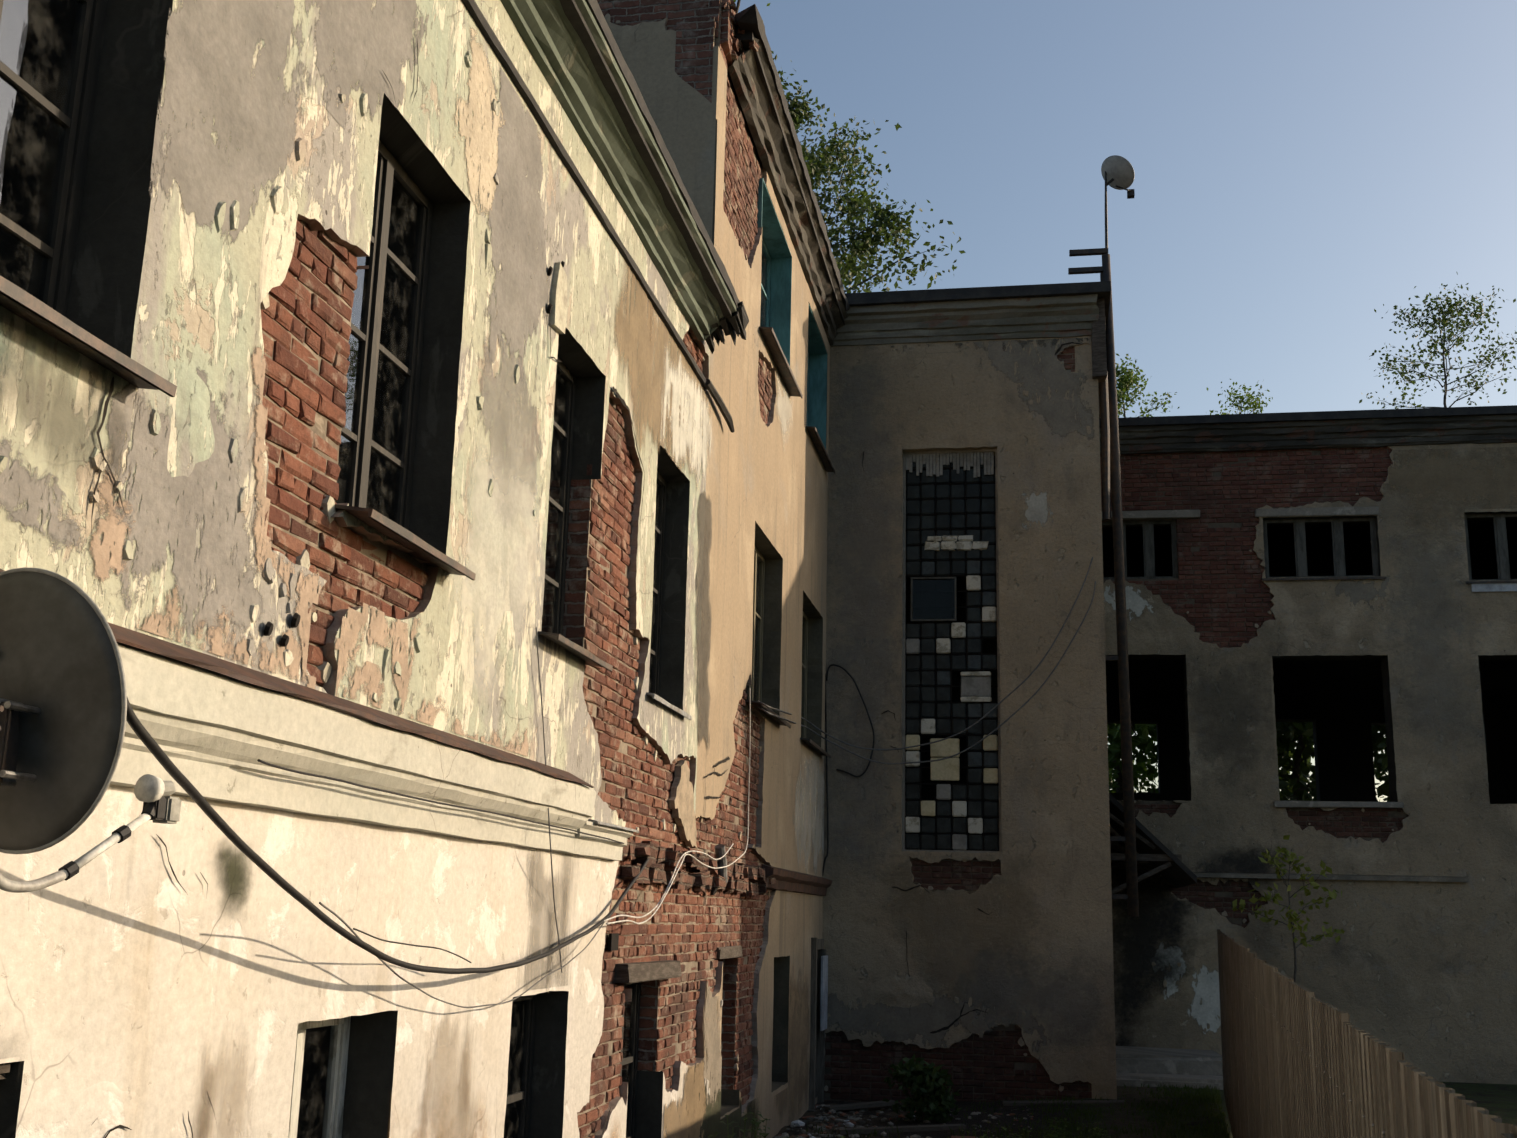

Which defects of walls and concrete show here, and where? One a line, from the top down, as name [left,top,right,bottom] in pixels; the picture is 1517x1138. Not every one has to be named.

peeling [150,0,429,245]
spalling [656,0,763,261]
peeling [452,28,567,526]
spalling [683,331,704,373]
spalling [1057,347,1075,372]
spalling [0,220,529,757]
spalling [1100,447,1393,648]
spalling [563,398,771,1138]
spalling [909,856,1002,894]
spalling [824,1024,1092,1102]
peeling [1152,942,1221,1034]